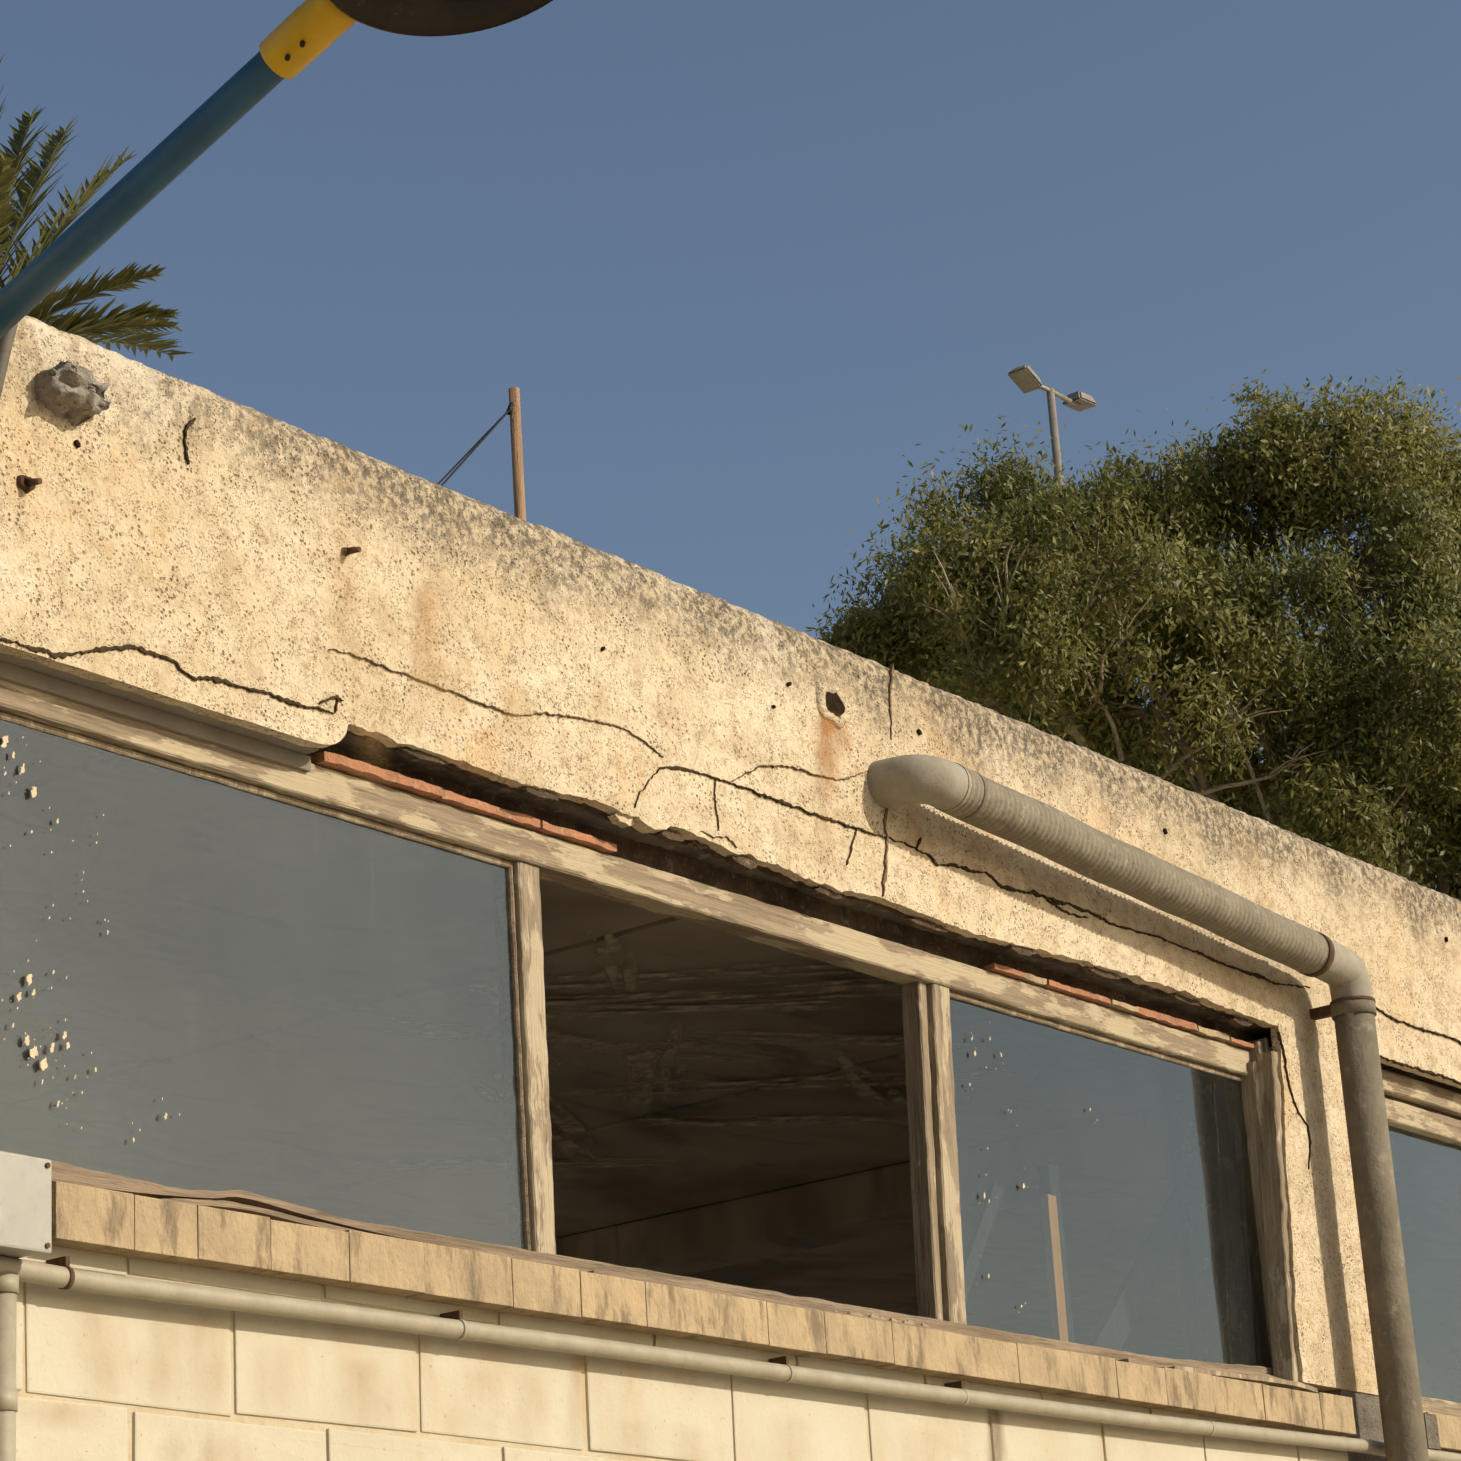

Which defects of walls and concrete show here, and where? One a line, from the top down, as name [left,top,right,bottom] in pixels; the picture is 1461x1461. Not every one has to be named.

crack [0,638,344,714]
flaking render [346,730,1261,1028]
crack [328,648,1310,988]
crack [1376,1007,1461,1085]